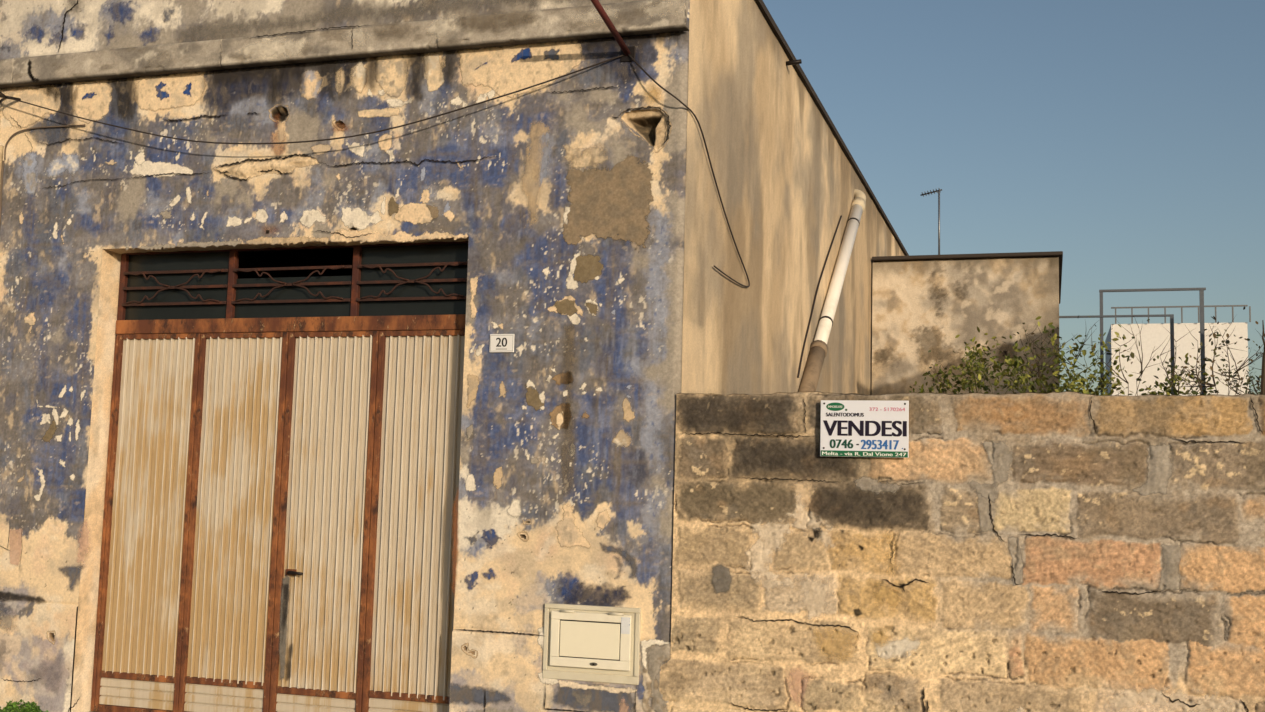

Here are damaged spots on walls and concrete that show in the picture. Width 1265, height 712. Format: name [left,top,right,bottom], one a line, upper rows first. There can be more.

peeling [3,82,112,128]
peeling [135,72,205,111]
peeling [301,55,412,118]
peeling [424,41,582,107]
peeling [125,152,468,250]
flaking render [548,106,672,325]
water stain [998,344,1016,362]
peeling [37,385,86,443]
water stain [0,591,45,629]
water stain [59,523,88,590]
corrosion [279,576,292,680]
peeling [465,568,496,589]